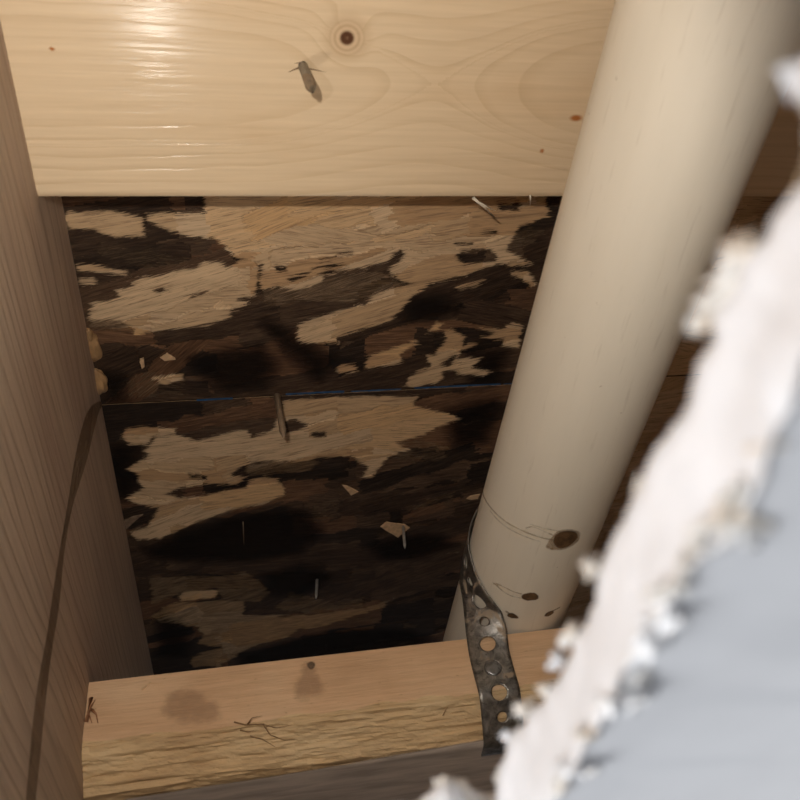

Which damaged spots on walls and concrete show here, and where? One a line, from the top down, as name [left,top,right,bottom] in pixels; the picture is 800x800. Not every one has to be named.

leakage [26,196,562,800]
leakage [508,523,579,550]
crack [234,716,293,747]